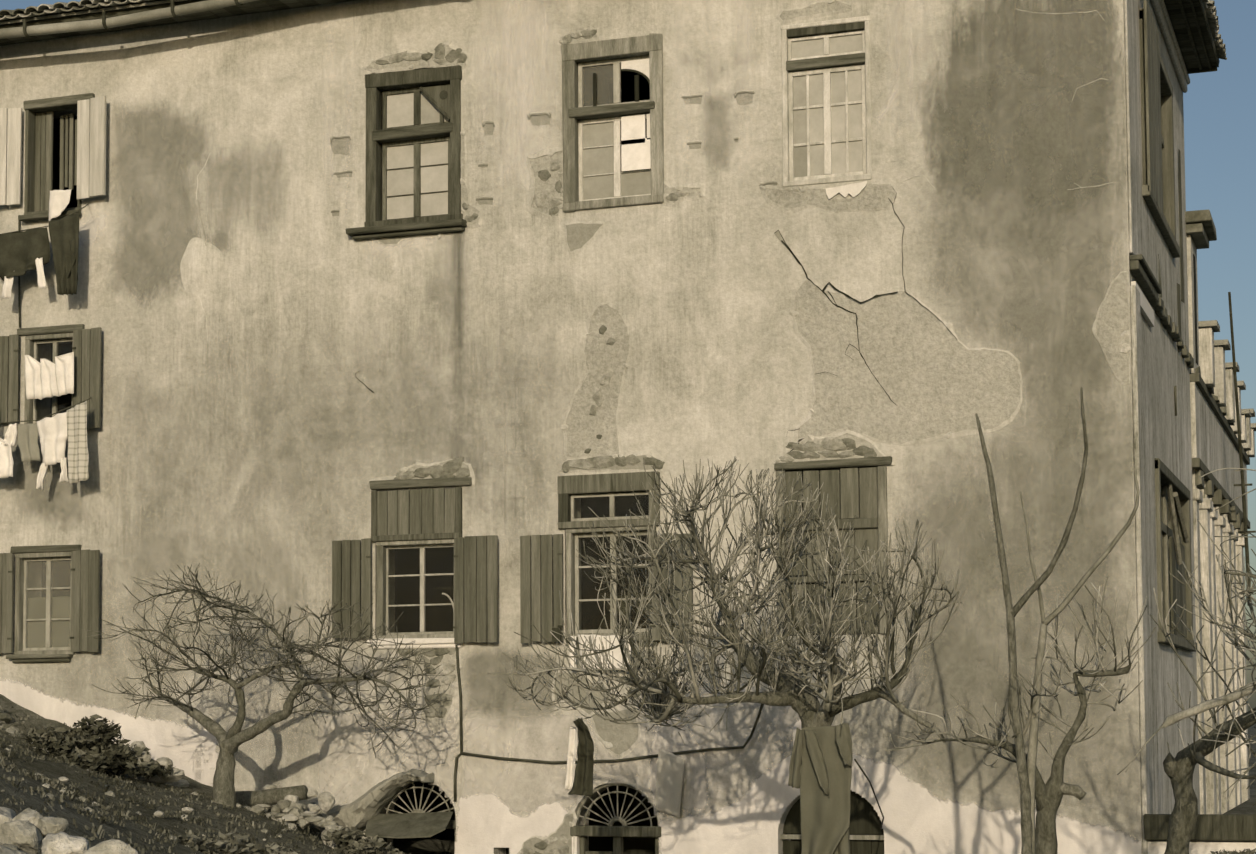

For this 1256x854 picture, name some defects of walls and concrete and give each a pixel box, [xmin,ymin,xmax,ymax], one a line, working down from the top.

flaking render [364,36,469,73]
flaking render [526,146,605,255]
flaking render [758,177,904,214]
flaking render [559,301,666,473]
crack [774,188,957,405]
flaking render [773,274,1024,466]
damp [916,0,1118,783]
flaking render [1092,271,1132,386]
flaking render [368,457,476,487]
flaking render [393,648,464,734]
flaking render [517,810,578,854]